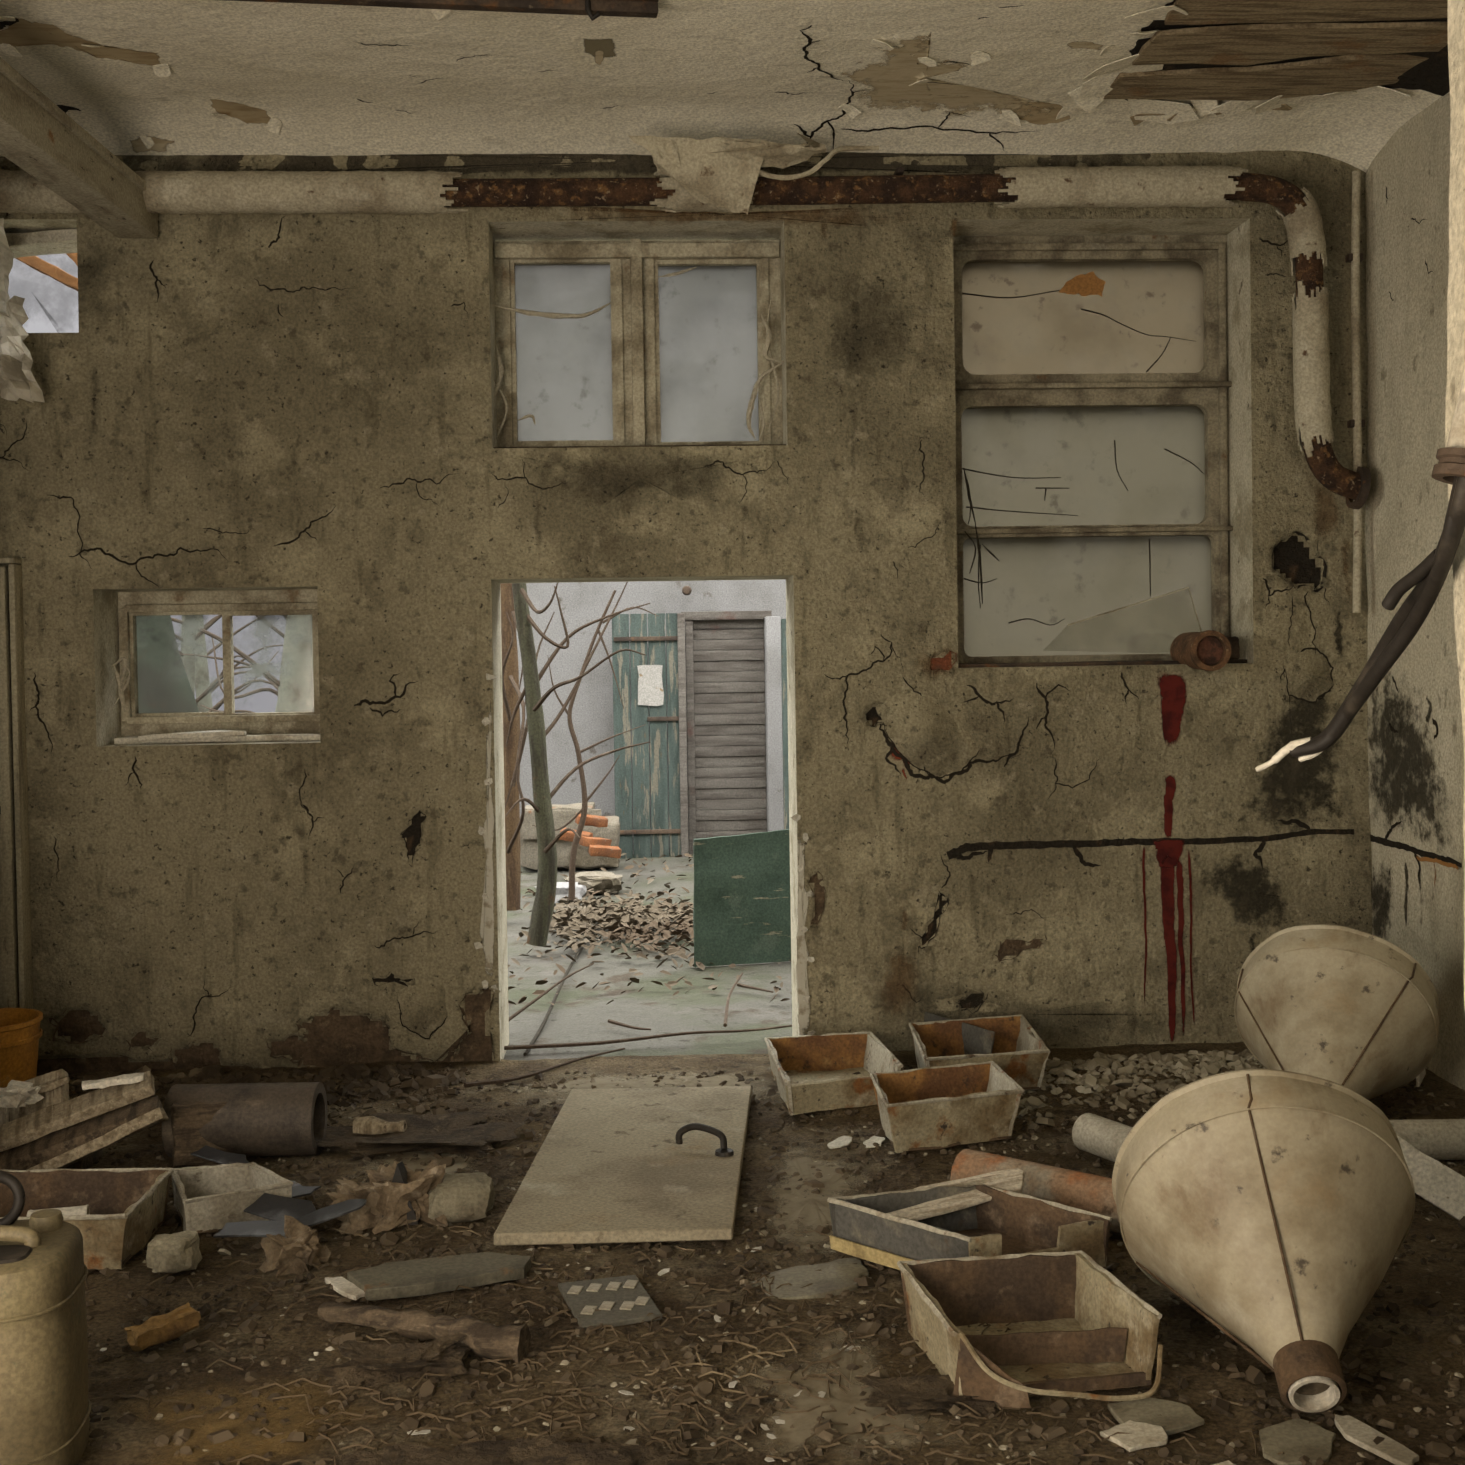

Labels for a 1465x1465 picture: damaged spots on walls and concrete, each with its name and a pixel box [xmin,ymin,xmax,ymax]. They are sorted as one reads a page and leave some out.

peeling [838,5,1188,127]
peeling [1128,86,1410,126]
crack [0,420,335,585]
flaking render [1272,529,1330,592]
crack [824,635,1101,799]
water stain [1367,677,1445,846]
crack [941,819,1462,888]